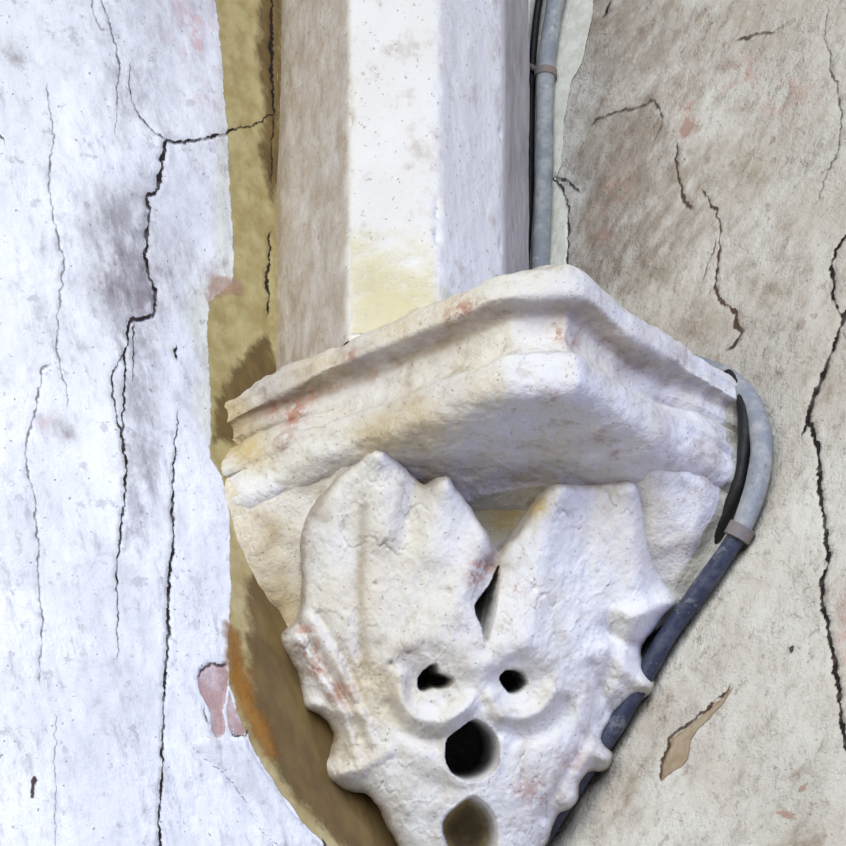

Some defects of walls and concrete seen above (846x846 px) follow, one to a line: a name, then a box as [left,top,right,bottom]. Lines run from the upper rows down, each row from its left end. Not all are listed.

crack [157,414,179,846]
crack [91,0,275,656]
flaking render [207,0,277,486]
flaking render [198,509,347,846]
crack [593,98,663,130]
flaking render [660,687,733,780]
crack [674,144,744,349]
crack [738,26,782,40]
crack [801,234,846,750]
crack [822,13,843,185]